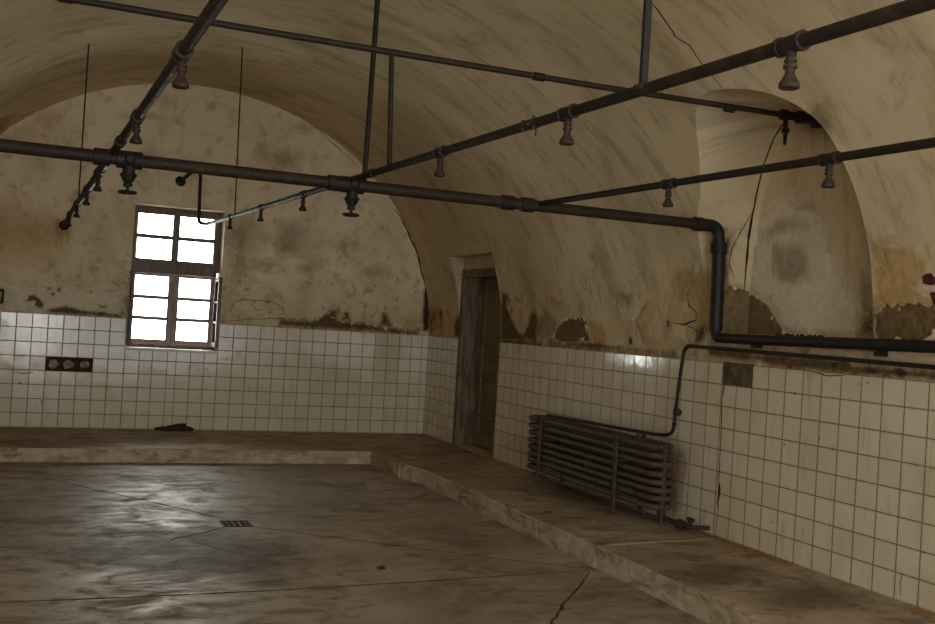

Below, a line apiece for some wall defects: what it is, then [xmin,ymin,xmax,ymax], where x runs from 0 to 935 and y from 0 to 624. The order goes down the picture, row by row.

crack [652,4,723,88]
peeling [13,278,124,313]
flaking render [552,316,590,342]
peeling [722,201,855,335]
flaking render [875,273,935,341]
crack [680,366,726,540]
crack [43,477,265,560]
crack [0,526,589,624]